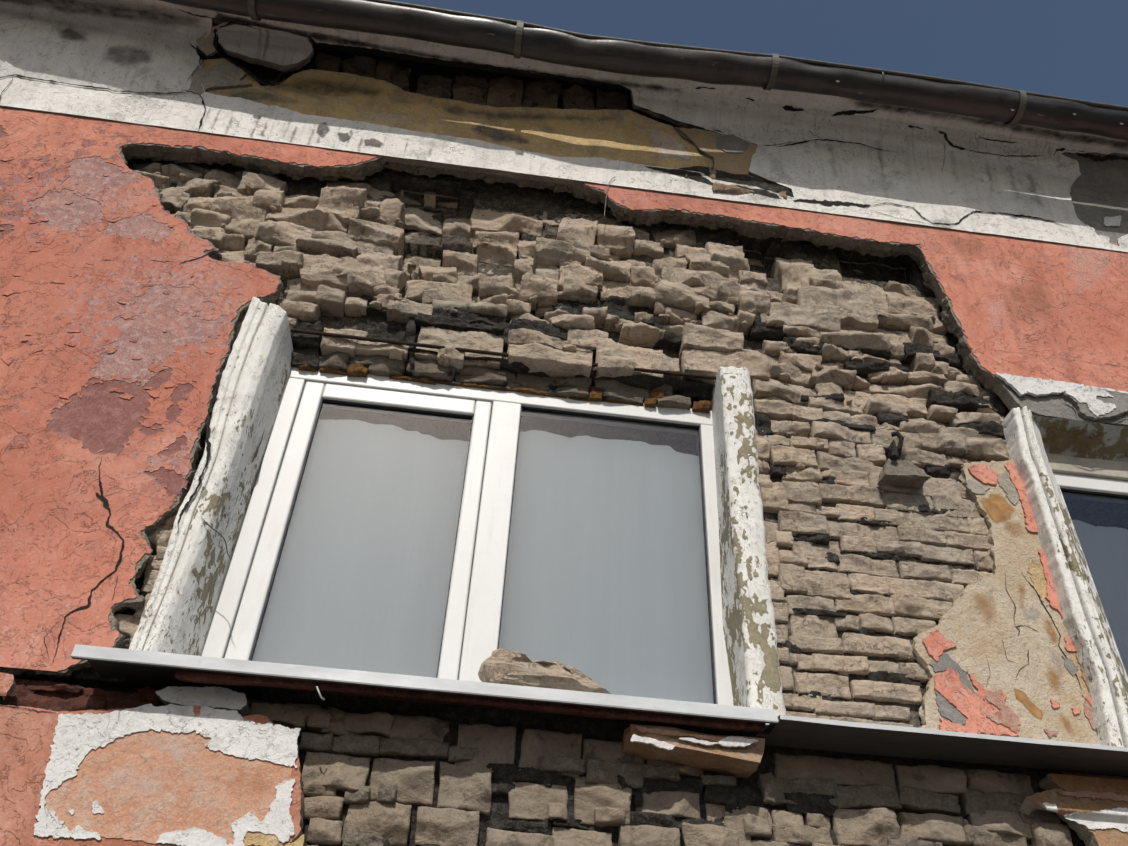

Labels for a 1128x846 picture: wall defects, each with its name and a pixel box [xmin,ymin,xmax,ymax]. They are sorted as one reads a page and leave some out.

flaking render [185,21,794,199]
crack [632,105,1128,171]
crack [793,199,1067,227]
flaking render [0,152,1128,737]
crack [44,463,124,661]
flaking render [3,667,1128,846]